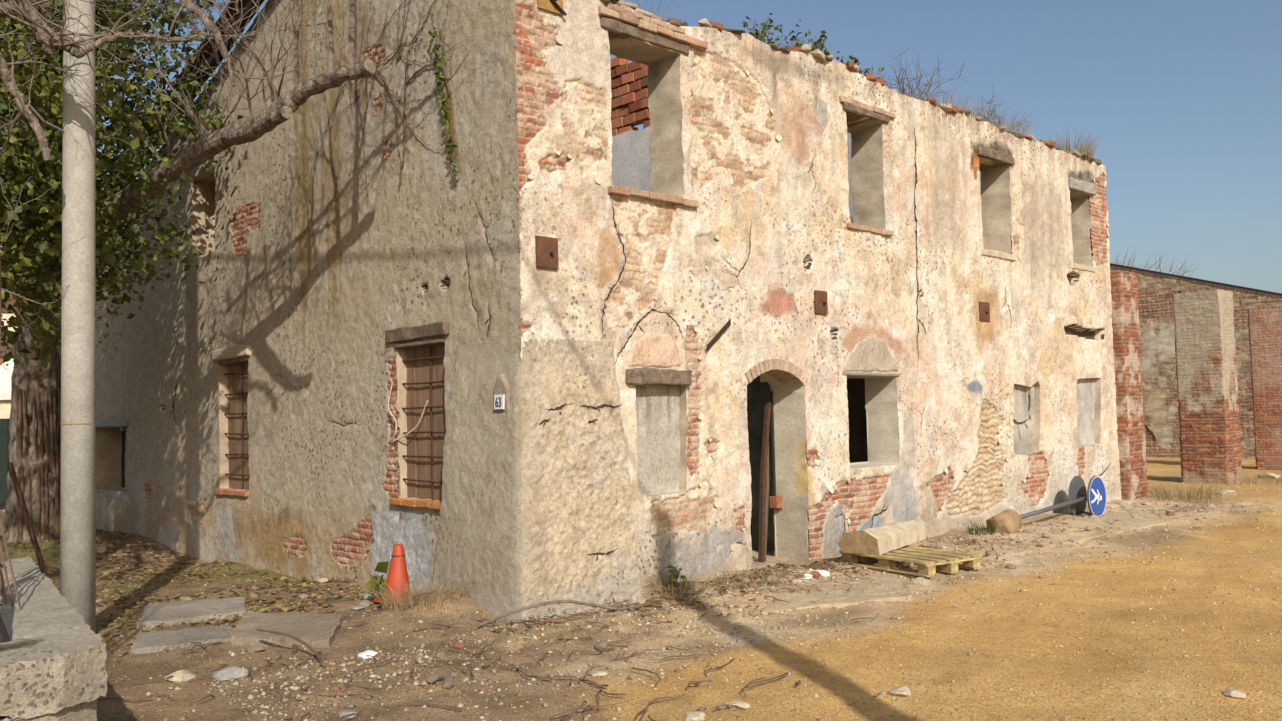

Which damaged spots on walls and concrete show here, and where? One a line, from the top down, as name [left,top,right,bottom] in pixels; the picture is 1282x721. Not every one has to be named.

spalling [515,0,678,329]
spalling [689,49,782,190]
crack [914,109,926,364]
spalling [331,513,374,568]
spalling [381,356,399,498]
spalling [650,326,746,537]
spalling [807,474,889,561]
spalling [920,400,1051,518]